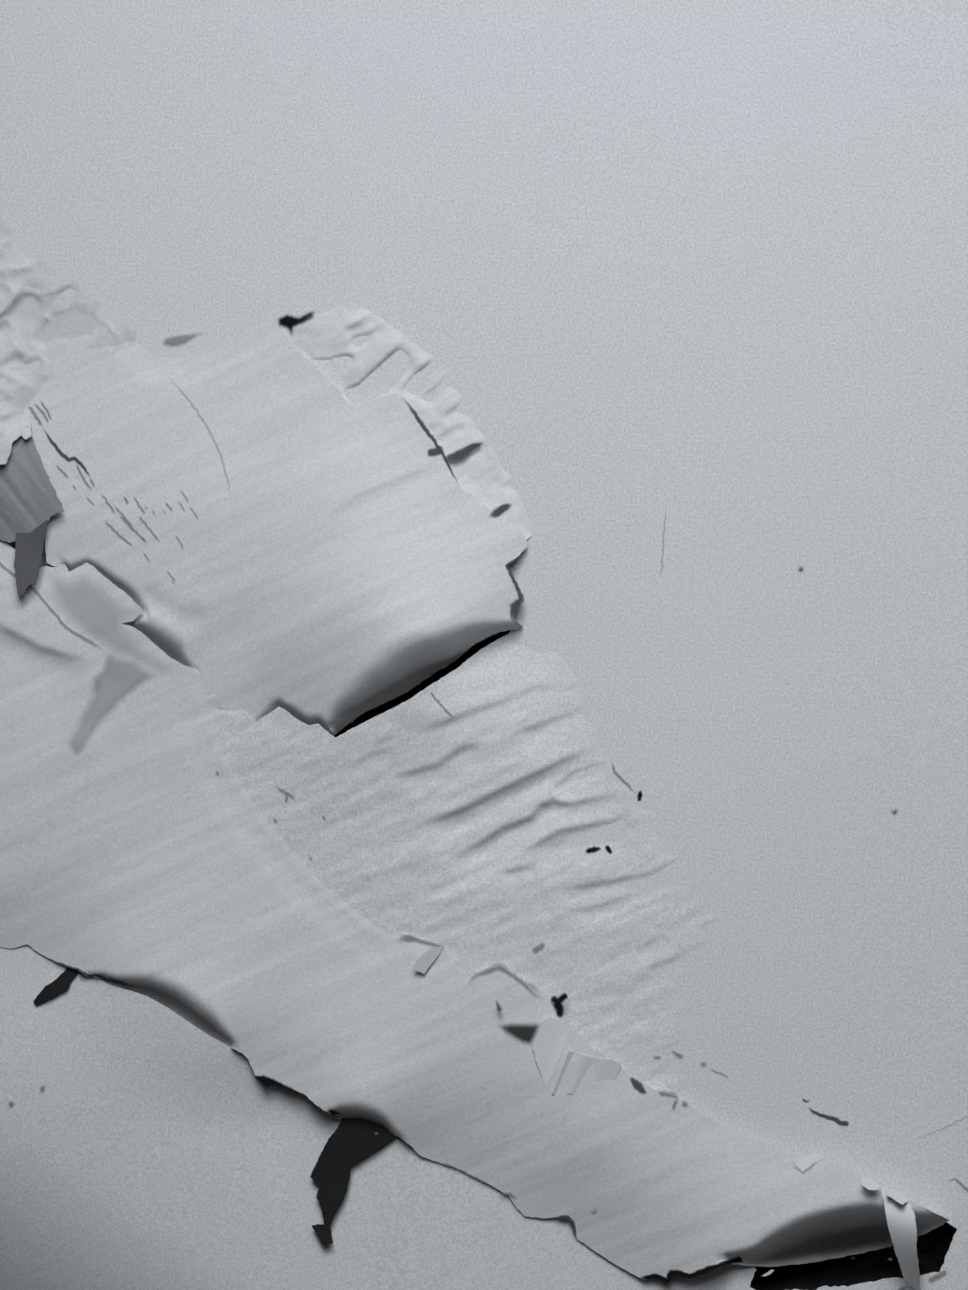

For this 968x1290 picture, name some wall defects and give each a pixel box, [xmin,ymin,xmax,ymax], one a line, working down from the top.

peeling [0,298,957,1290]